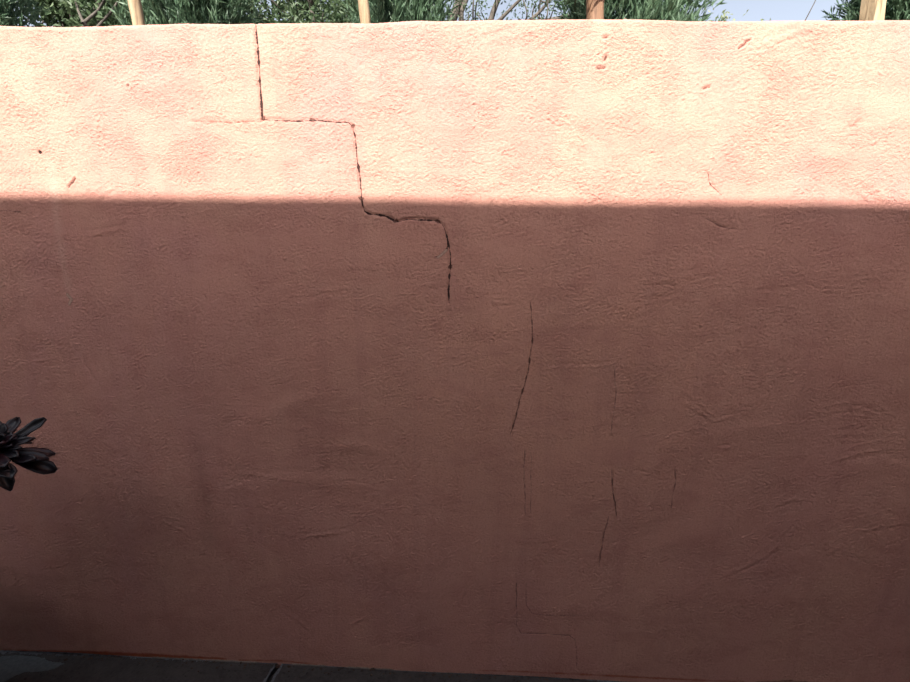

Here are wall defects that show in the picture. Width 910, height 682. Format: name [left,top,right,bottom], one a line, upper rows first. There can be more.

crack [255,30,452,299]
crack [511,302,533,431]